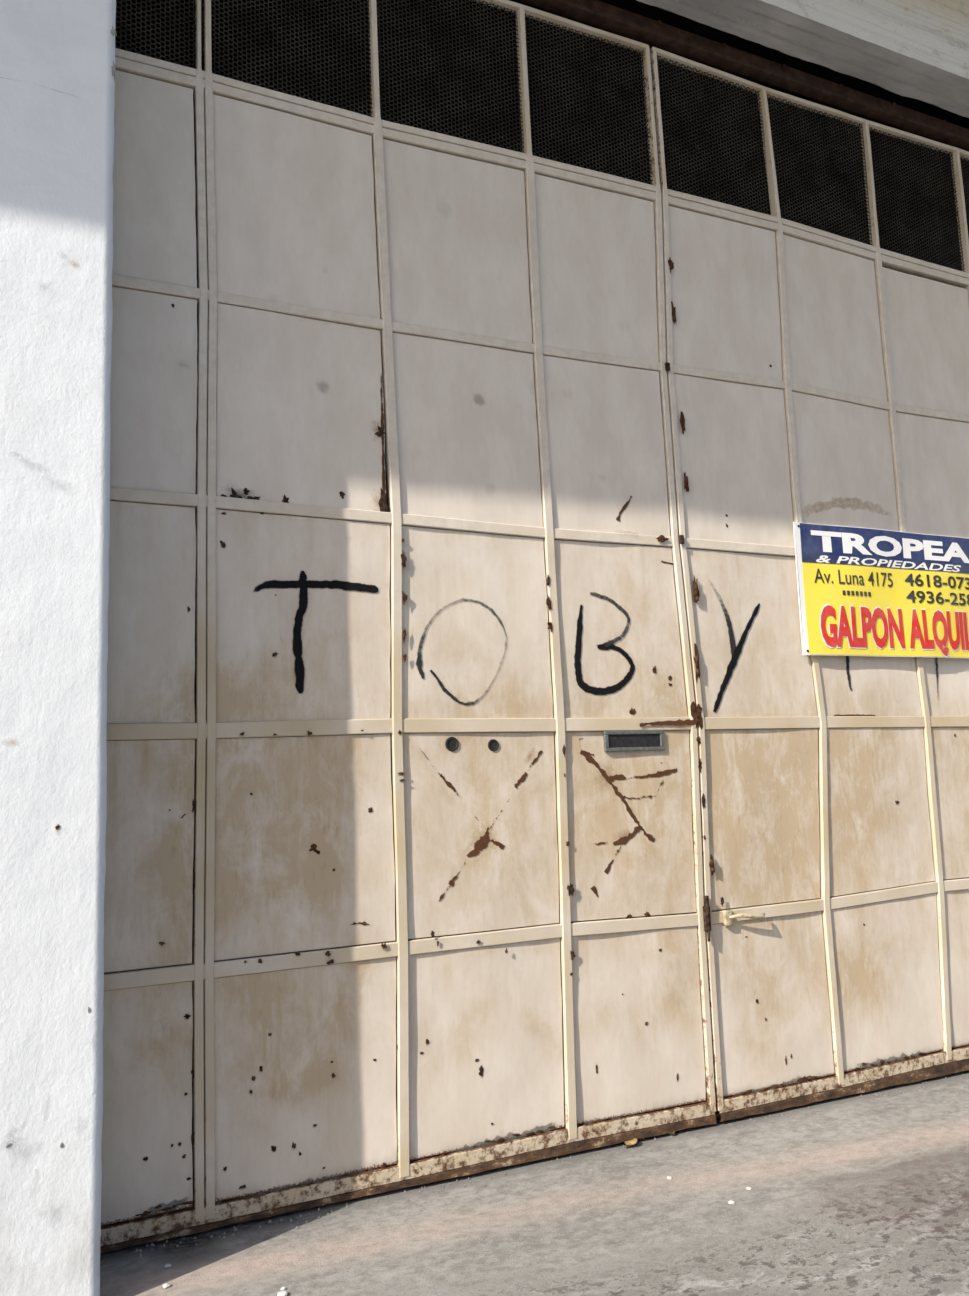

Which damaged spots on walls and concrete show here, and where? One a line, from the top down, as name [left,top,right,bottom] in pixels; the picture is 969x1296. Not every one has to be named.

corrosion [375,375,389,512]
corrosion [221,488,264,515]
corrosion [629,701,703,773]
corrosion [562,738,677,874]
corrosion [439,750,543,901]
corrosion [853,1052,925,1070]
corrosion [732,1076,818,1097]
corrosion [441,1123,556,1156]
corrosion [238,1163,387,1198]
corrosion [135,1199,194,1217]